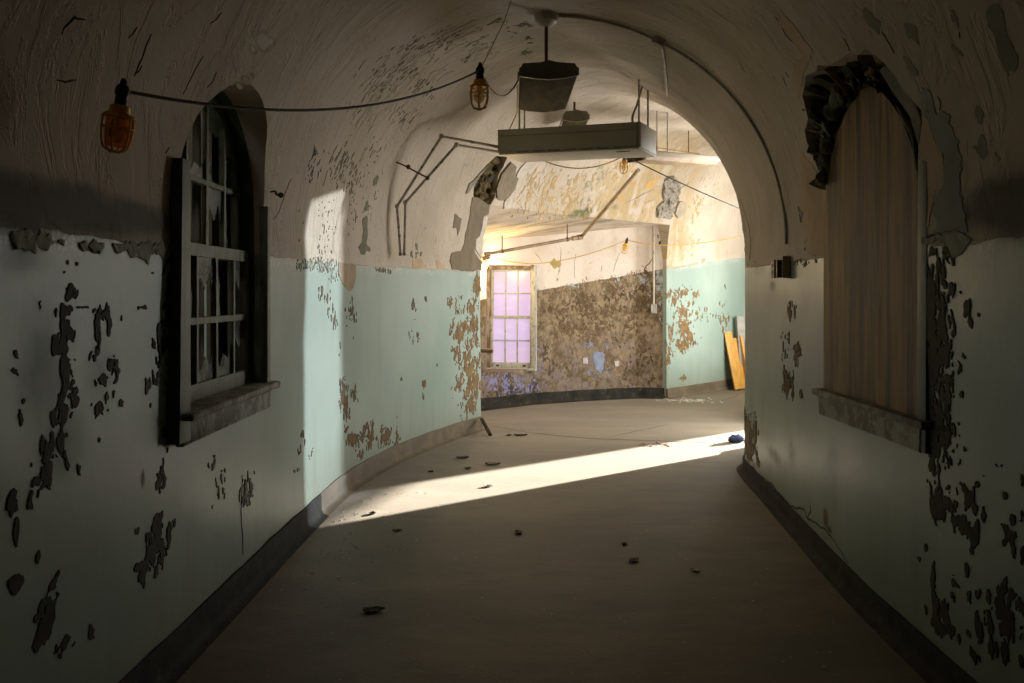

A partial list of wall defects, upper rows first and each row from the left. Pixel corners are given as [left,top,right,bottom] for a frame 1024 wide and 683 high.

spalling [802,55,922,190]
peeling [296,17,533,339]
spalling [10,228,66,254]
flaking render [410,156,730,421]
peeling [6,239,172,547]
peeling [239,471,255,508]
peeling [338,377,401,460]
peeling [744,409,760,468]
peeling [782,301,803,401]
peeling [917,227,1024,669]
peeling [133,511,176,589]
peeling [32,570,75,659]